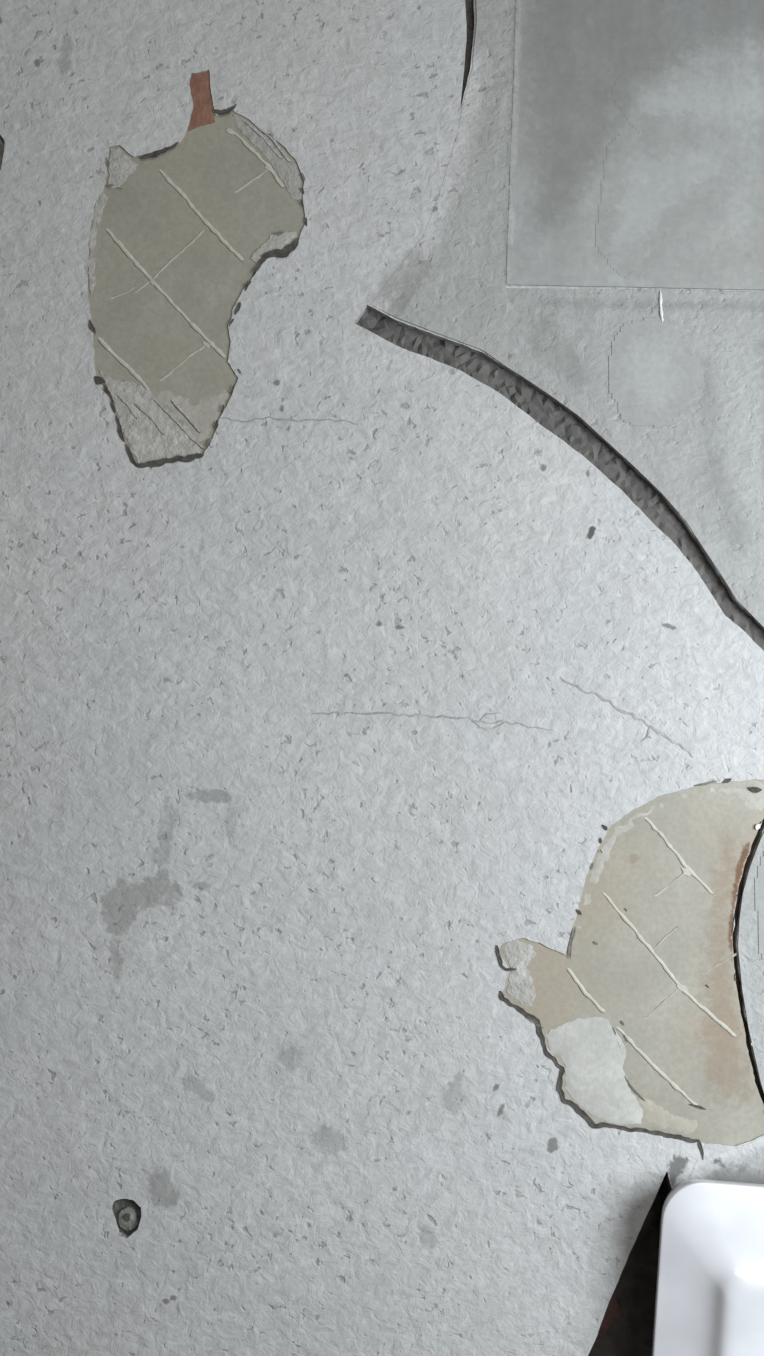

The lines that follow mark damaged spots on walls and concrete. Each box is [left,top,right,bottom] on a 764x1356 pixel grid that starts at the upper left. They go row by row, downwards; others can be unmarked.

spalling [87,71,307,468]